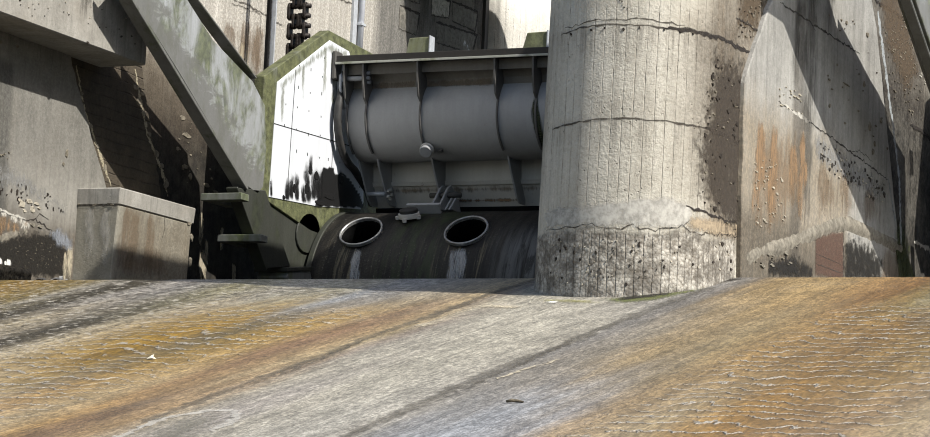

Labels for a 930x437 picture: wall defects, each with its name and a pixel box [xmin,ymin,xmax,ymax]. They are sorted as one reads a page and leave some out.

crack [563,17,758,53]
crack [780,2,859,53]
crack [554,117,737,142]
spalling [534,47,744,297]
rust [752,126,807,221]
leakage [350,252,361,279]
leakage [449,250,466,279]
spalling [815,232,844,277]